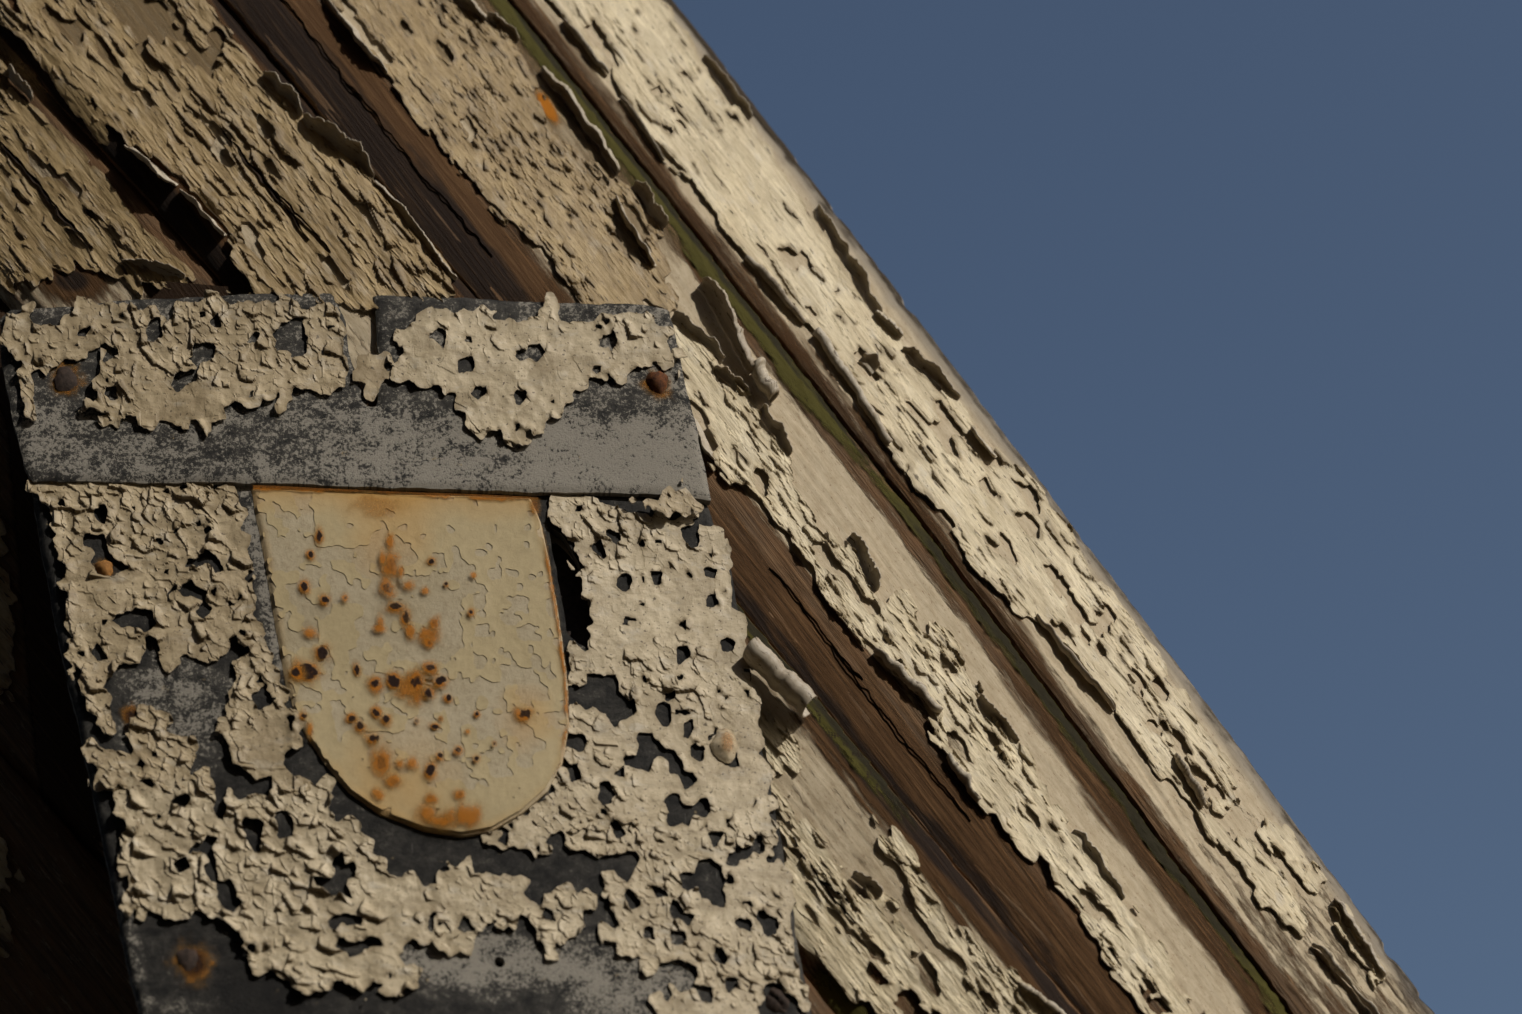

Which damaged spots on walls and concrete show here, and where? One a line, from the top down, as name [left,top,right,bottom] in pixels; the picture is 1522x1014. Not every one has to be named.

corrosion [253,485,570,746]
corrosion [346,535,481,827]
peeling [0,0,1212,1014]
peeling [549,0,1386,1014]